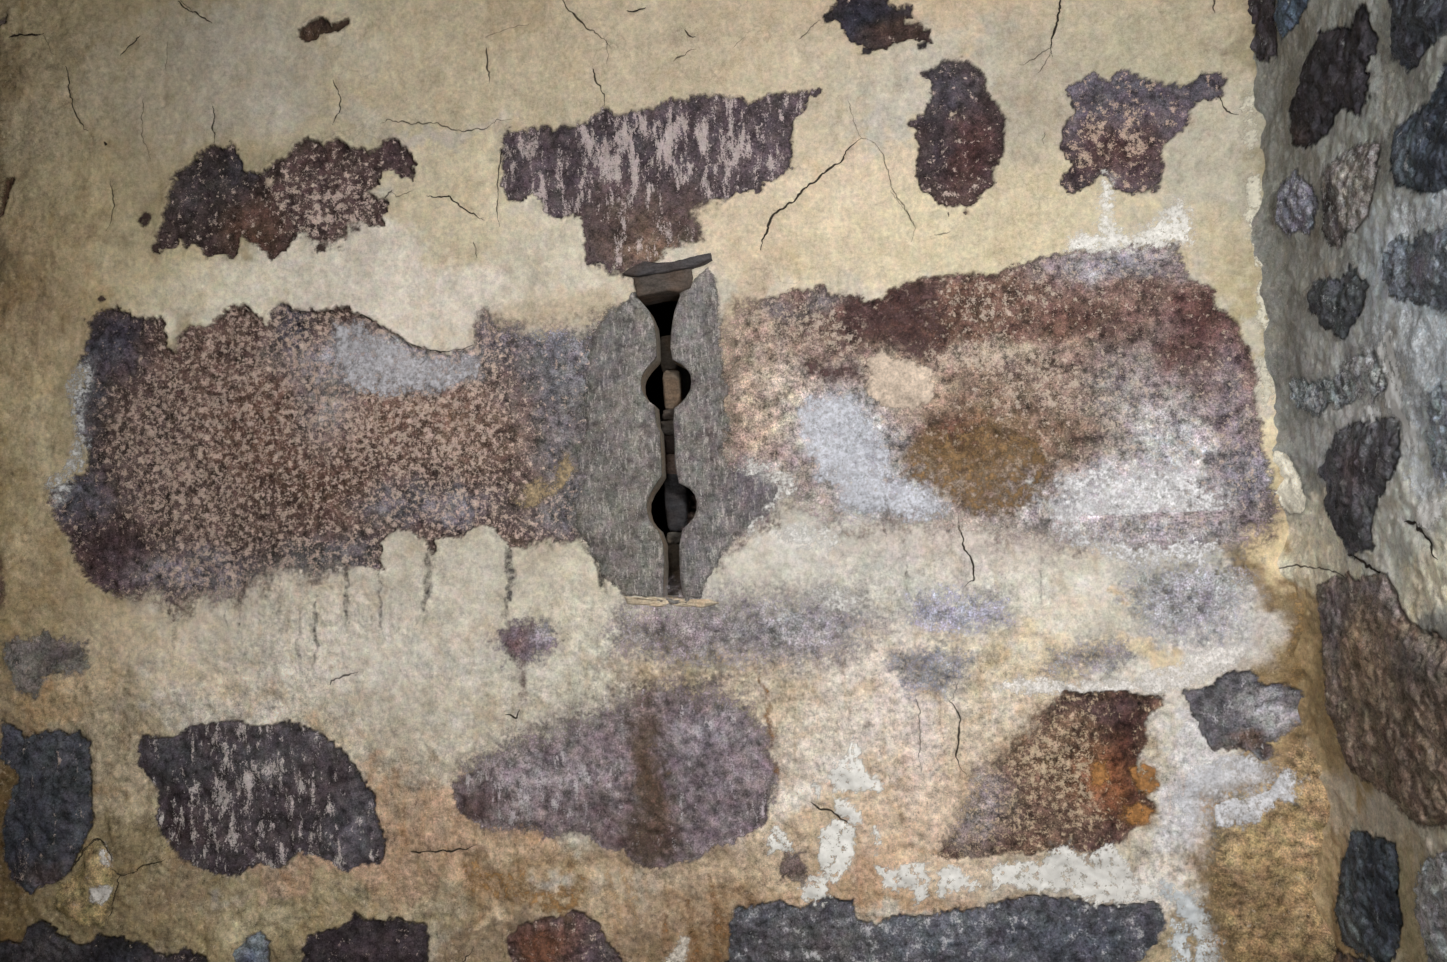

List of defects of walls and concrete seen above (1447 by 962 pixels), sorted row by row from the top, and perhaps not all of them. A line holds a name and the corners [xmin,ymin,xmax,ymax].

flaking render [138,137,418,261]
crack [380,119,512,257]
flaking render [500,87,821,278]
crack [760,103,949,250]
flaking render [720,59,1307,647]
flaking render [47,296,602,621]
flaking render [0,720,94,895]
flaking render [136,720,386,877]
flaking render [452,584,1224,962]
corrosion [1120,763,1160,825]
flaking render [1182,670,1304,760]
flaking render [301,912,429,962]